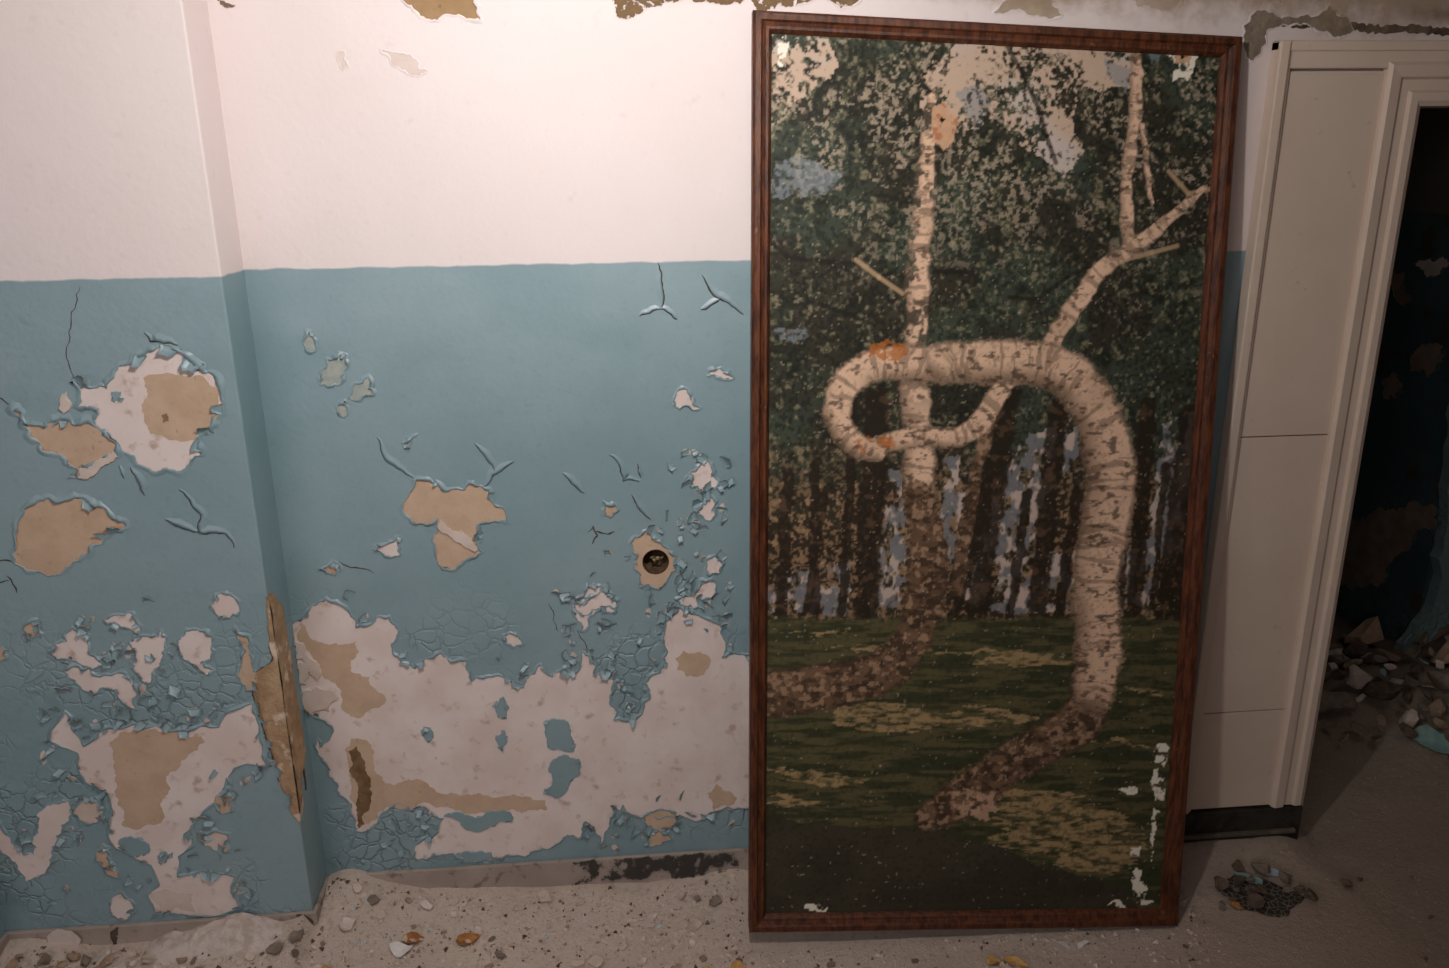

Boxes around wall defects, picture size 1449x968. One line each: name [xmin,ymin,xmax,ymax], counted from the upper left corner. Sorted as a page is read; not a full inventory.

spalling [400,0,484,25]
crack [66,288,80,377]
peeling [5,343,228,577]
peeling [1340,499,1440,592]
peeling [0,449,749,921]